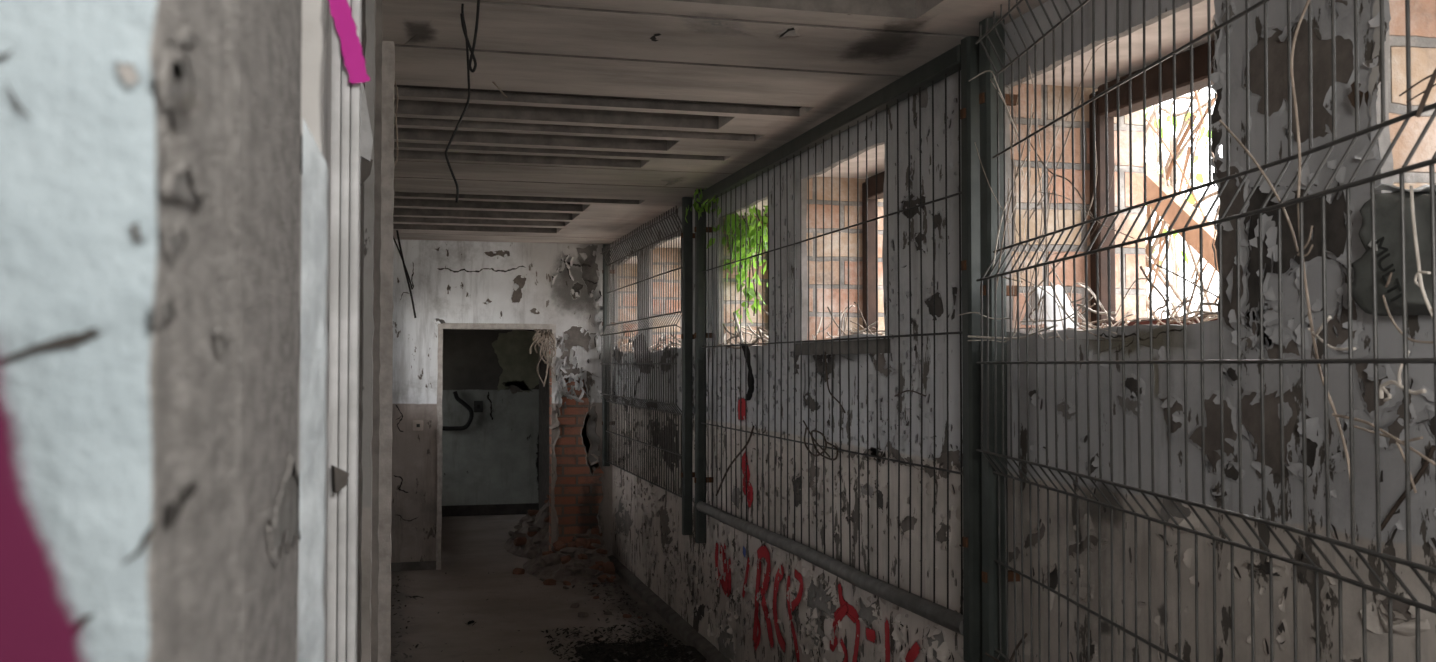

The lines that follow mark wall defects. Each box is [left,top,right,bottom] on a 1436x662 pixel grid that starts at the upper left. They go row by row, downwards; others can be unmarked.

crack [400,263,526,300]
peeling [484,249,511,258]
peeling [1115,0,1435,502]
flaking render [491,98,964,662]
peeling [1382,506,1404,548]
peeling [1226,551,1337,655]